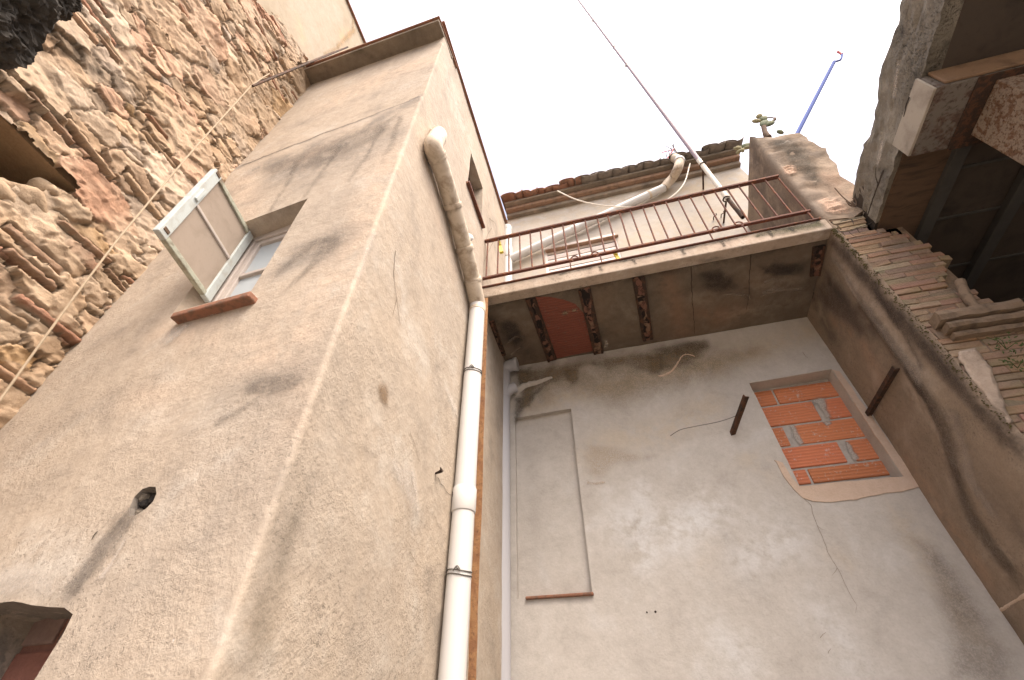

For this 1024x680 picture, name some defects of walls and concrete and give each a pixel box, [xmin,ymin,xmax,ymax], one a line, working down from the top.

corrosion [632,277,653,342]
leakage [516,344,704,416]
peeling [774,370,919,502]
leakage [821,241,1012,572]
hole [134,493,156,515]